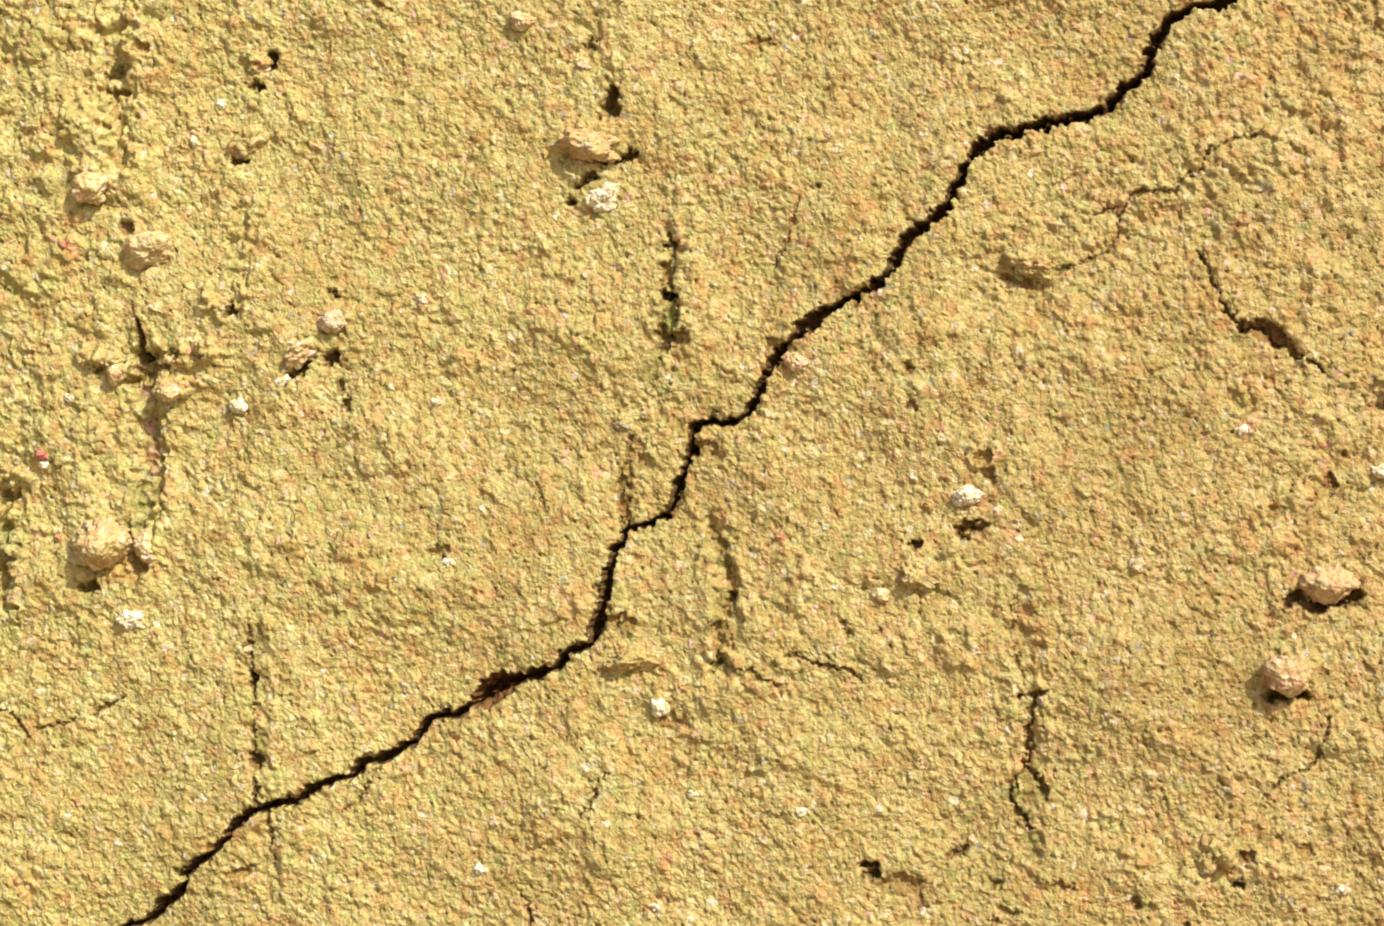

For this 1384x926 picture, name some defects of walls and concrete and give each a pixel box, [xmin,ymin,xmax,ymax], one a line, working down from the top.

crack [132,307,156,361]
crack [524,0,1257,687]
crack [1198,253,1324,373]
crack [242,617,265,772]
crack [122,669,529,926]
crack [579,772,609,817]
crack [1008,596,1049,830]
crack [1263,716,1330,796]
crack [520,891,534,926]